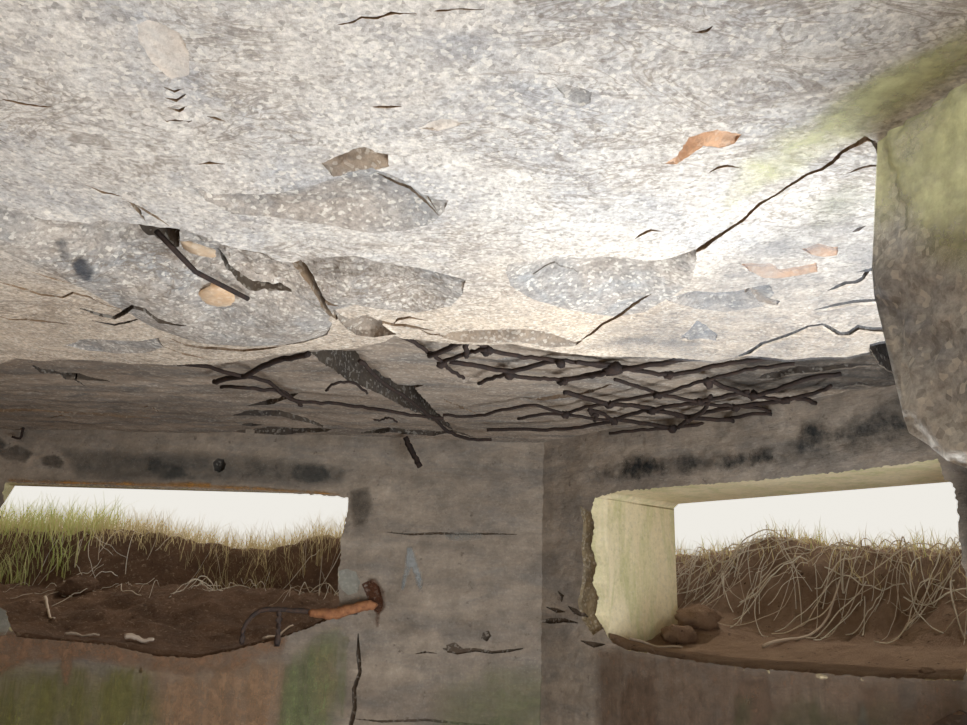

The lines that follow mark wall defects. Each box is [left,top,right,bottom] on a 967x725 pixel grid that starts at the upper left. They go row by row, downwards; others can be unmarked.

crack [2,99,49,107]
spalling [665,129,742,164]
spalling [192,147,449,233]
crack [696,136,876,252]
peeling [0,204,895,468]
crack [582,294,651,340]
crack [739,268,883,357]
crack [760,363,867,387]
rust [369,579,384,623]
crack [416,647,523,655]
crack [349,633,488,725]